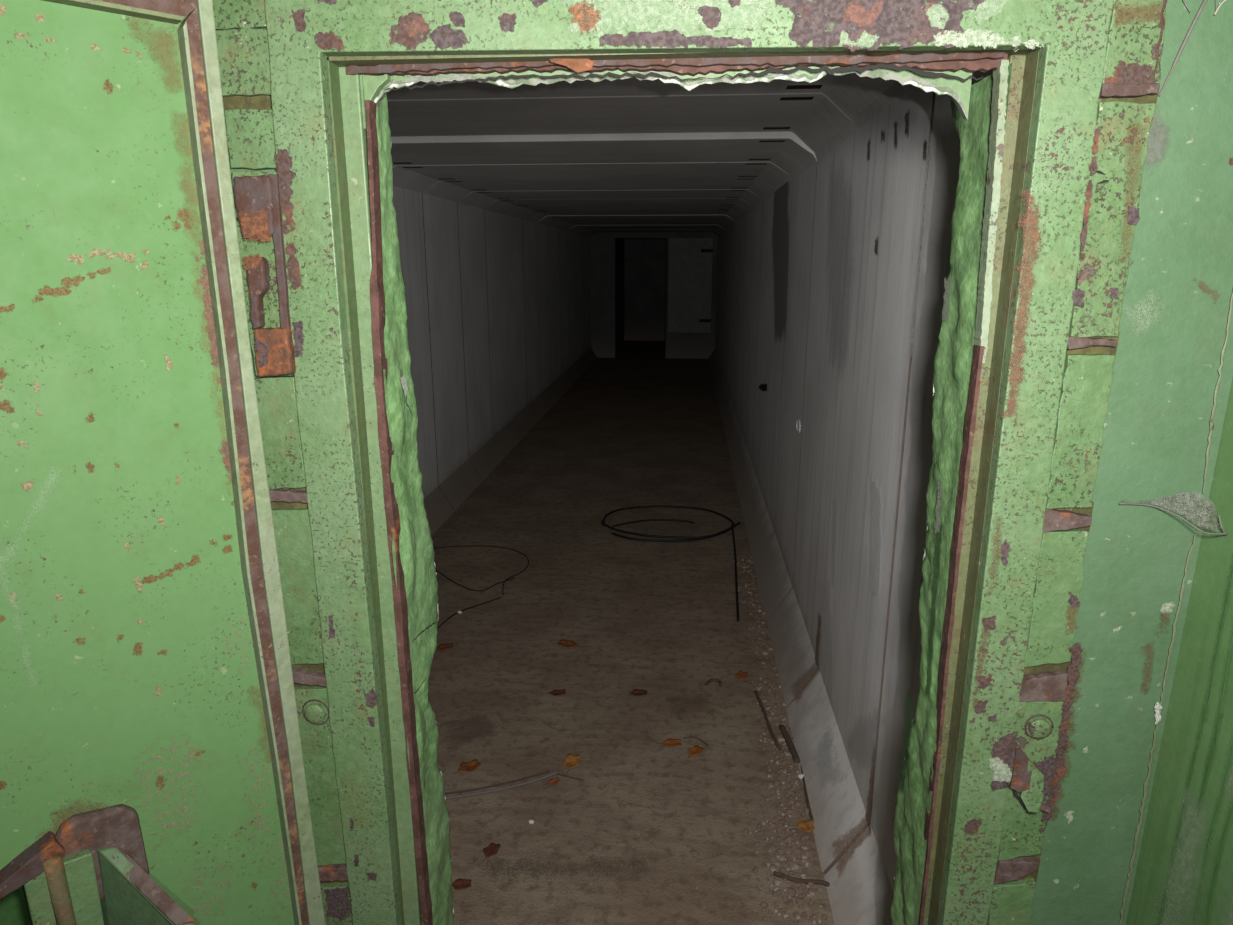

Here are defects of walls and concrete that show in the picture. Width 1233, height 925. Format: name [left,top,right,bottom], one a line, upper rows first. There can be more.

corrosion [292,0,344,52]
corrosion [346,0,566,75]
corrosion [532,0,1005,68]
corrosion [1104,0,1168,84]
spalling [374,82,415,103]
spalling [472,77,524,88]
spalling [652,77,712,91]
spalling [734,70,836,84]
spalling [903,80,953,96]
corrosion [239,149,304,290]
corrosion [32,248,149,304]
corrosion [1001,190,1043,419]